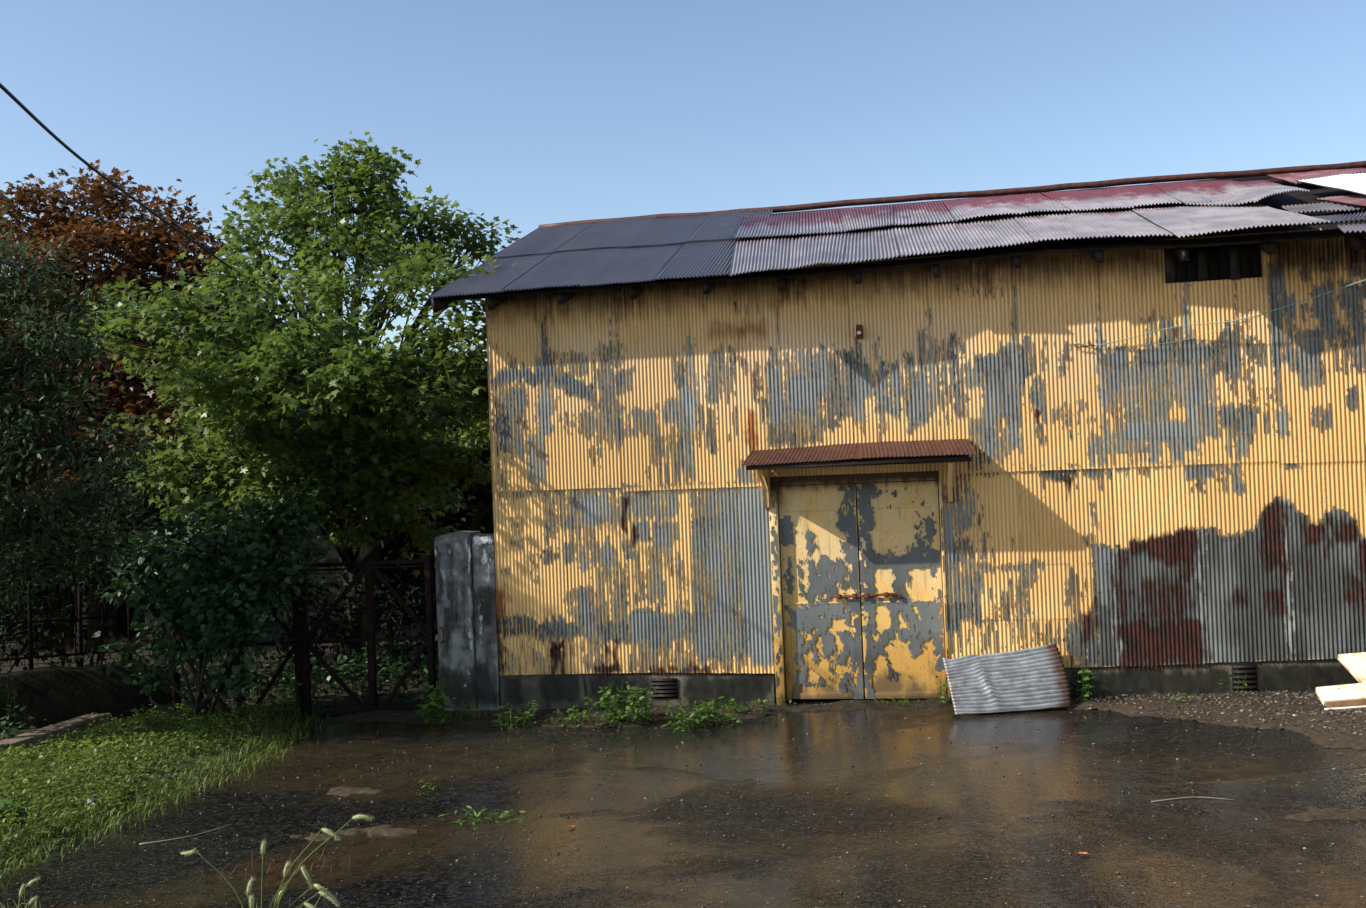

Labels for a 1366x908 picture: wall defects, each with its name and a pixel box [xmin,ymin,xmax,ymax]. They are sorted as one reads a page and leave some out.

rust [748,411,758,450]
peeling [434,261,1366,699]
rust [1228,501,1366,616]
leakage [435,553,522,709]
rust [1080,596,1098,643]
rust [1113,528,1212,671]
rust [550,639,573,677]
leakage [539,673,650,709]
rust [594,640,621,677]
rust [650,662,709,676]